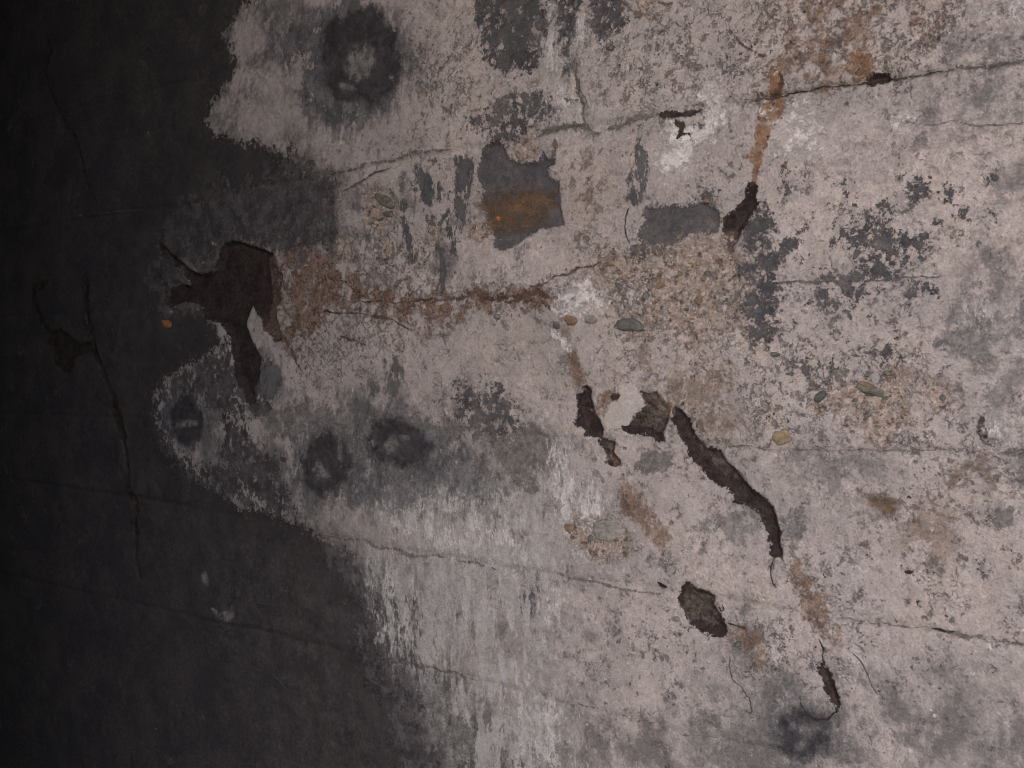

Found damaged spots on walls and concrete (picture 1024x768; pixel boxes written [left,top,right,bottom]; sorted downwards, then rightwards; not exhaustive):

water stain [254,0,414,139]
rust [747,0,903,183]
crack [736,37,1023,102]
water stain [398,153,480,295]
spalling [159,240,283,405]
rust [275,243,558,366]
spalling [573,385,621,467]
spalling [621,390,783,588]
water stain [163,356,621,768]
crack [557,573,668,595]
spalling [677,581,728,638]
crack [839,617,1024,646]